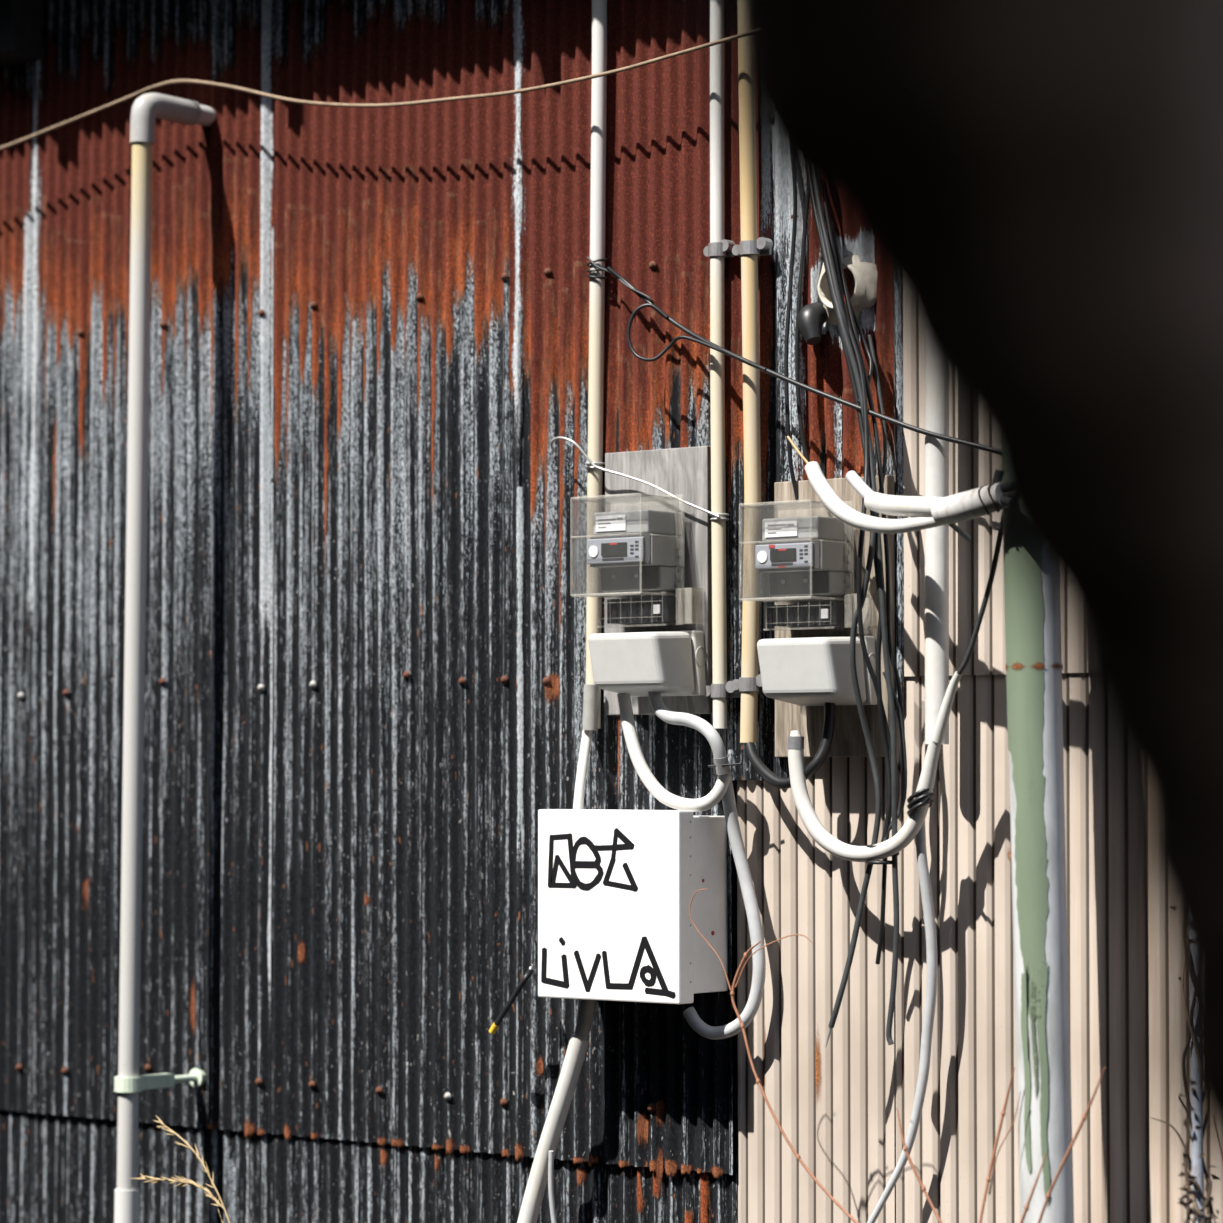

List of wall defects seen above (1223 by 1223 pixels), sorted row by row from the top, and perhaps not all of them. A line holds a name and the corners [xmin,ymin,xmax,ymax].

peeling [0,49,113,625]
corrosion [0,0,592,626]
peeling [152,0,526,1004]
peeling [516,372,588,868]
peeling [627,404,662,451]
corrosion [603,0,744,511]
peeling [687,352,709,447]
corrosion [757,173,773,507]
corrosion [789,213,894,481]
corrosion [378,1138,402,1168]
corrosion [432,1138,470,1172]
corrosion [619,1110,723,1223]